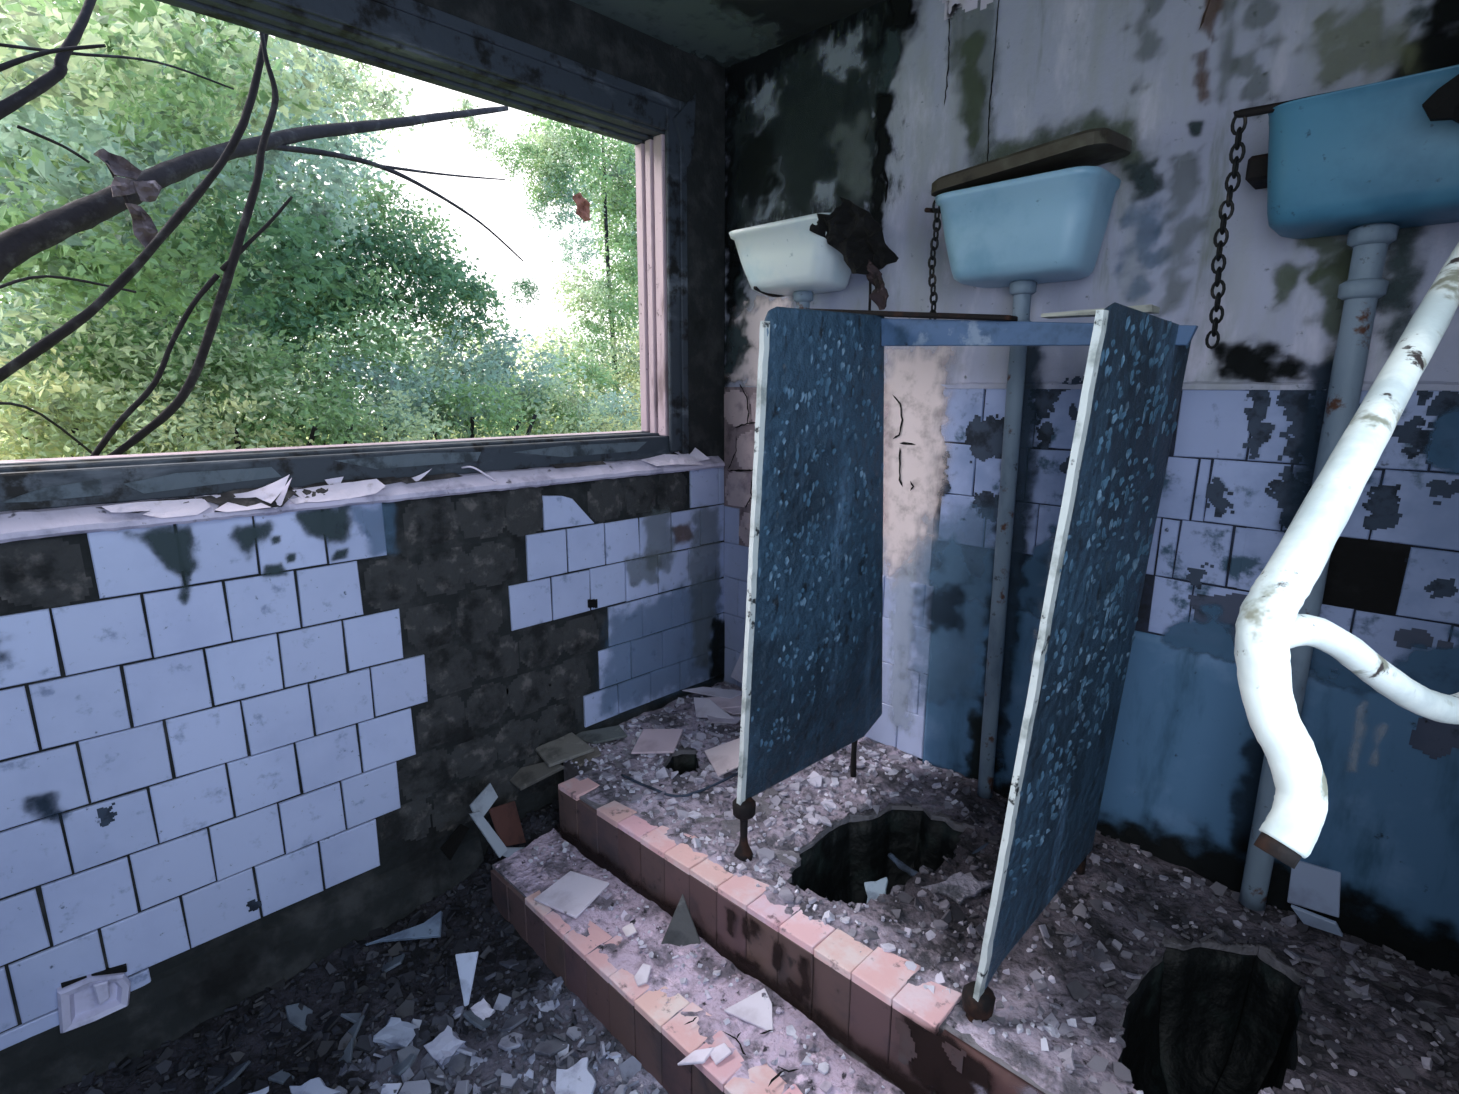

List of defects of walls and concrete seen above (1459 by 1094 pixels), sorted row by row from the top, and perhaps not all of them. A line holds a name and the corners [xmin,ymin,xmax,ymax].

peeling [570,0,785,64]
damp [1316,0,1459,85]
damp [961,32,1162,199]
damp [724,0,918,386]
damp [1275,234,1353,337]
damp [1376,226,1423,349]
peeling [965,414,1005,463]
peeling [515,297,951,776]
damp [966,346,1042,780]
spalling [0,452,599,842]
peeling [774,743,893,827]
spalling [895,1016,992,1094]